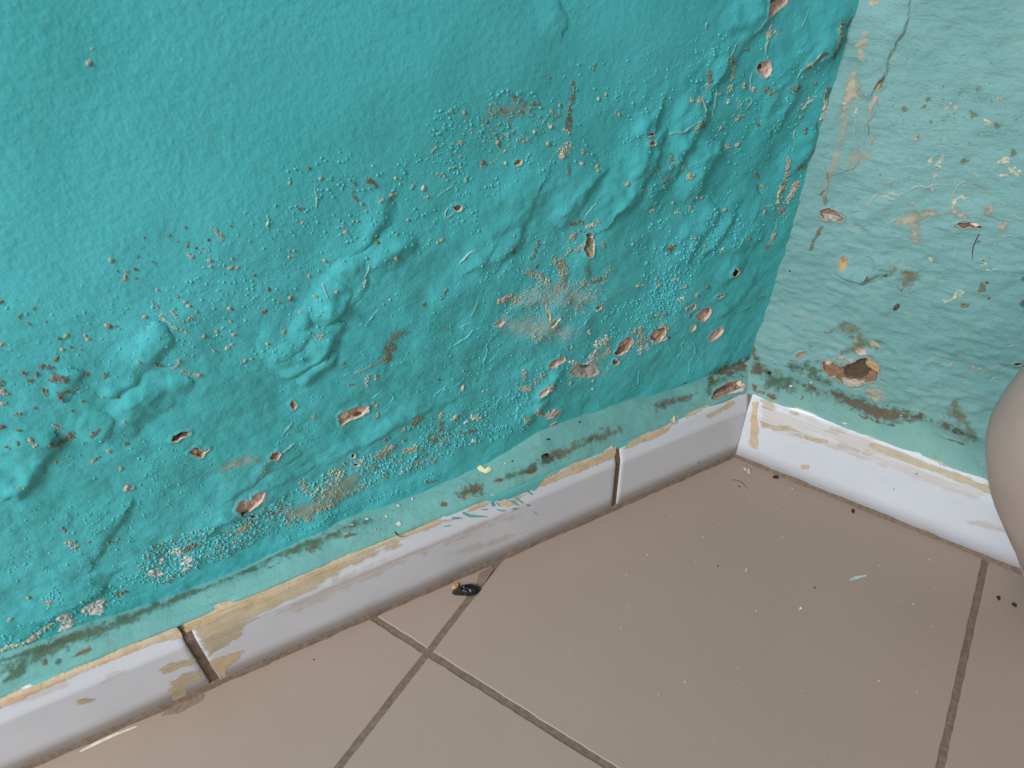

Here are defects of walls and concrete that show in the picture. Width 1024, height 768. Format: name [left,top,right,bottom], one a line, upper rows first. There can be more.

flaking render [754,57,775,81]
crack [837,2,919,176]
flaking render [546,325,668,390]
flaking render [820,337,884,389]
flaking render [334,403,372,428]
water stain [536,409,562,426]
flaking render [167,428,213,461]
flaking render [232,489,268,520]
water stain [430,491,536,527]
water stain [148,547,195,576]
water stain [1,598,106,682]
water stain [160,659,195,674]